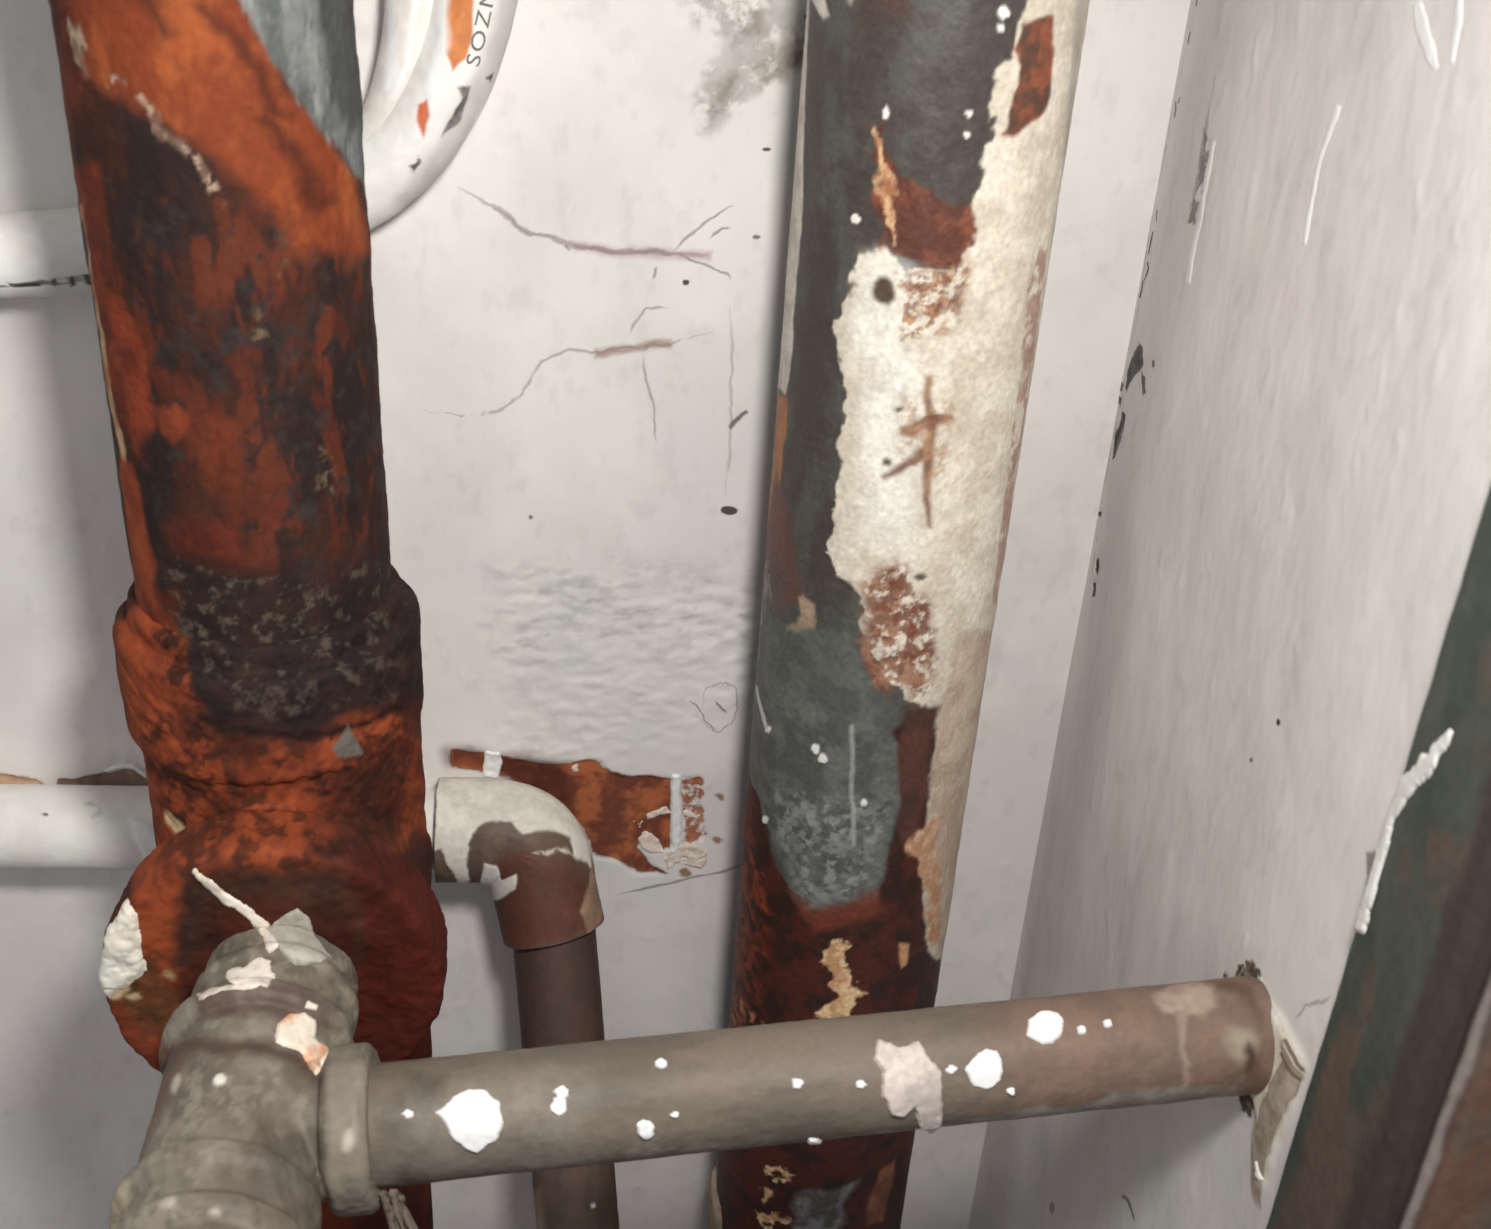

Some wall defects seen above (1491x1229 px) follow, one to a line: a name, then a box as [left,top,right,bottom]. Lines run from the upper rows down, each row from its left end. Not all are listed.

crack [499,209,664,253]
crack [597,341,669,356]
peeling [0,764,148,786]
peeling [450,749,723,876]
peeling [1366,852,1375,884]
peeling [1252,1042,1303,1203]